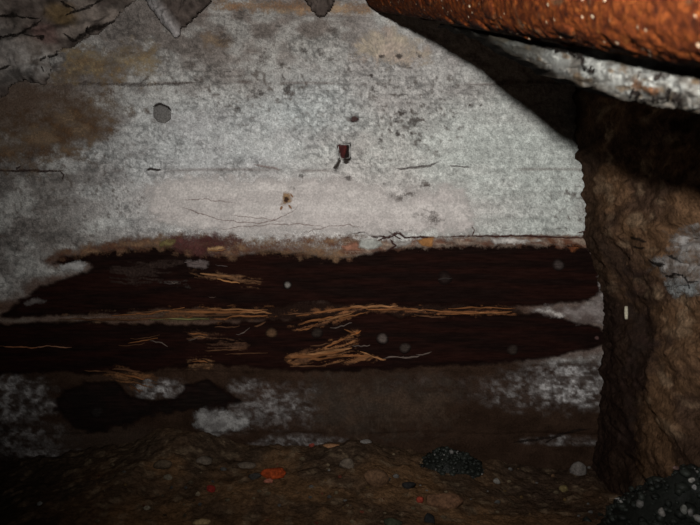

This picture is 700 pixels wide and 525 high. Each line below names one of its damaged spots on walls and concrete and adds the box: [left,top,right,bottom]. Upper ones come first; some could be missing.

damp [0,90,116,175]
crack [352,226,586,250]
damp [653,224,700,297]